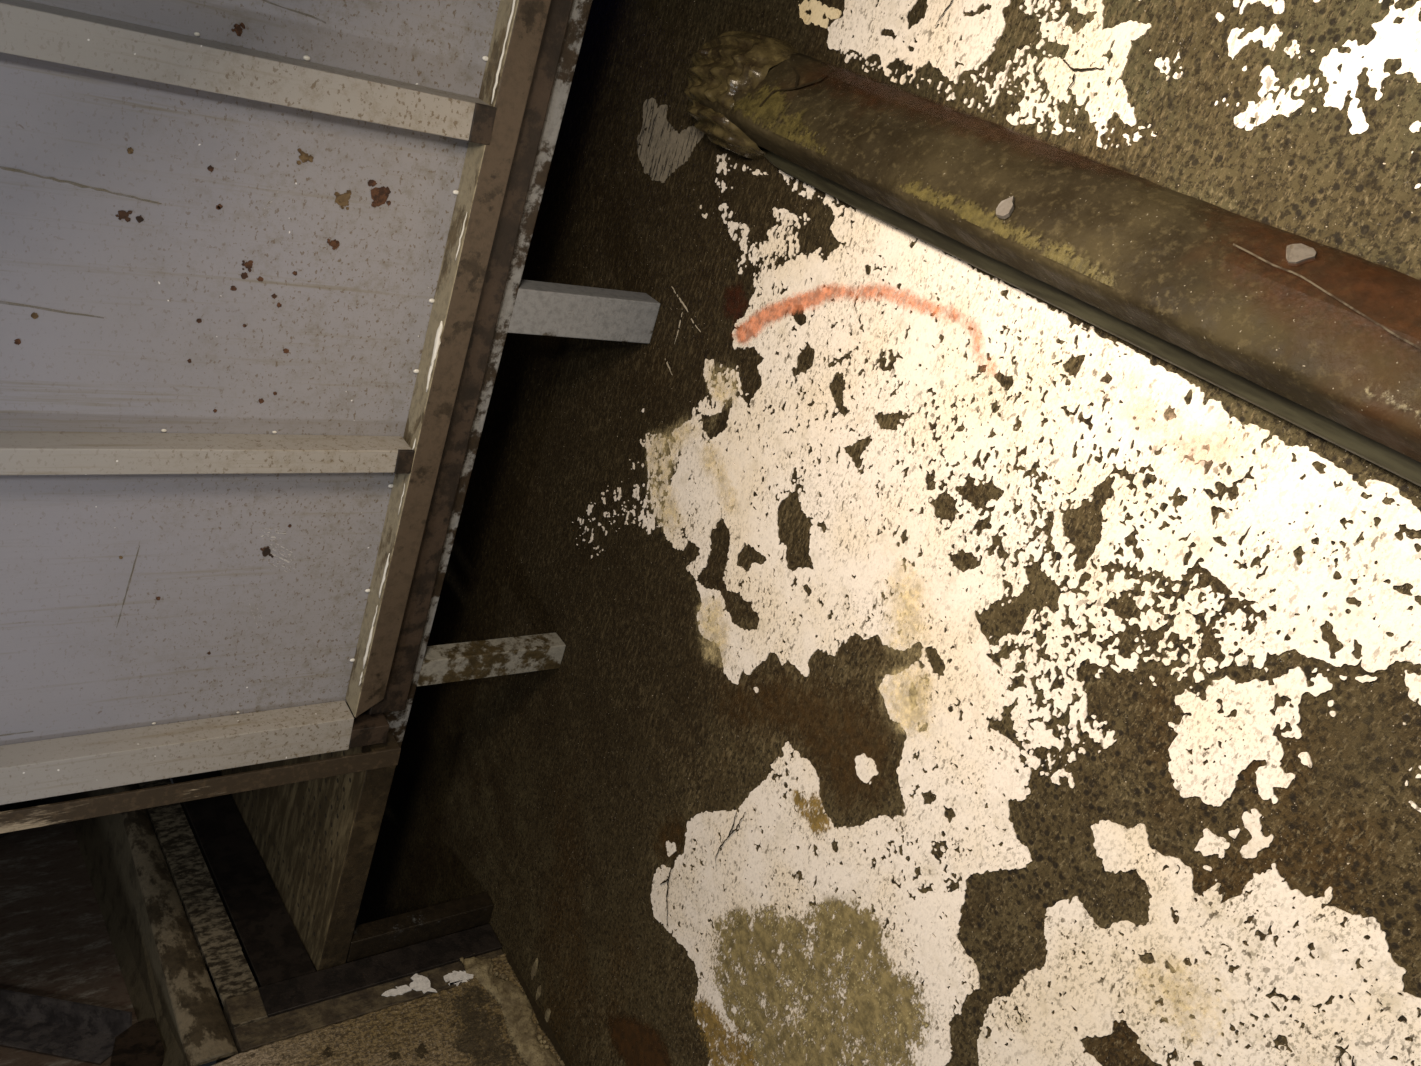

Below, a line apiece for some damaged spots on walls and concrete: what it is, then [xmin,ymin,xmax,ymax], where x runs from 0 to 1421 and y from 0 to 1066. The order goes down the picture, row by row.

peeling [798,0,1183,149]
peeling [1215,0,1421,135]
rust [297,148,314,165]
peeling [637,98,704,183]
rust [4,167,162,223]
rust [334,190,351,210]
rust [368,180,391,207]
rust [11,303,94,319]
rust [230,260,282,308]
rust [725,286,958,342]
peeling [572,153,1421,1066]
water stain [693,900,930,1066]